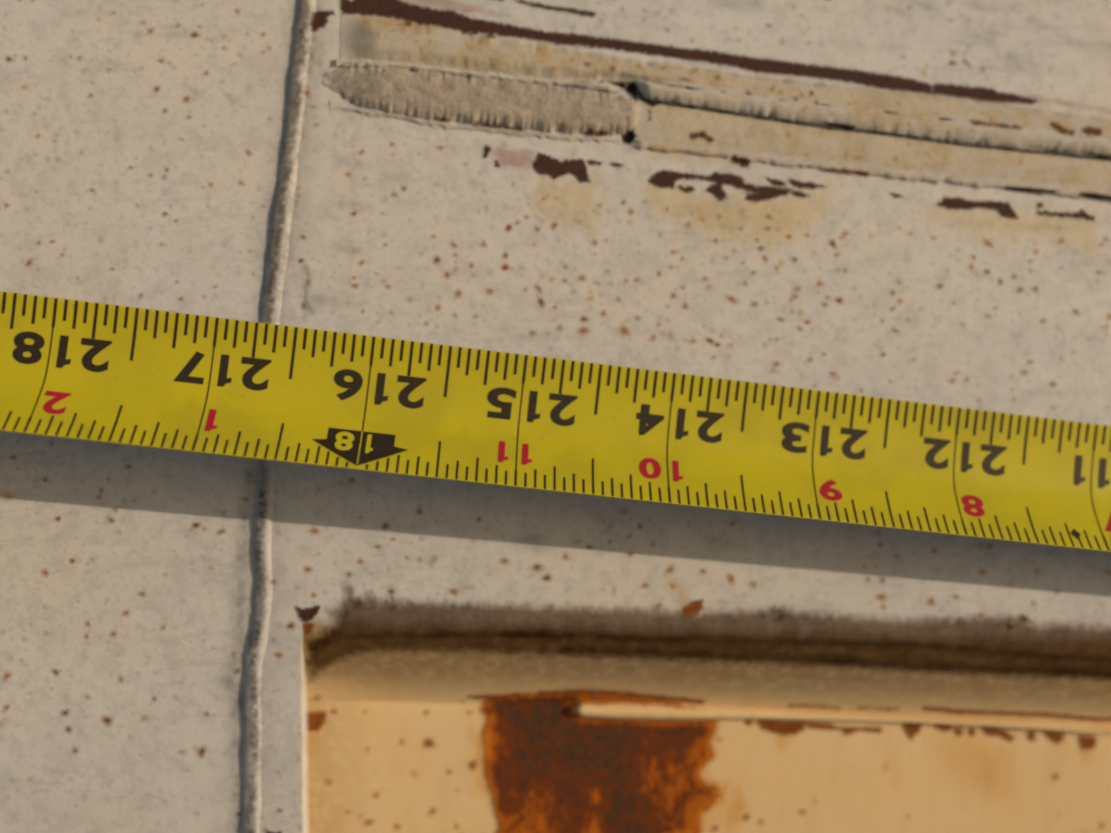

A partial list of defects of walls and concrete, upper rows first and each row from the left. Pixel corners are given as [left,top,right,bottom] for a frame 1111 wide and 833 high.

peeling [309,0,1039,105]
peeling [533,152,624,183]
peeling [649,158,827,202]
peeling [938,197,1020,219]
peeling [1037,202,1095,221]
corrosion [461,692,720,833]